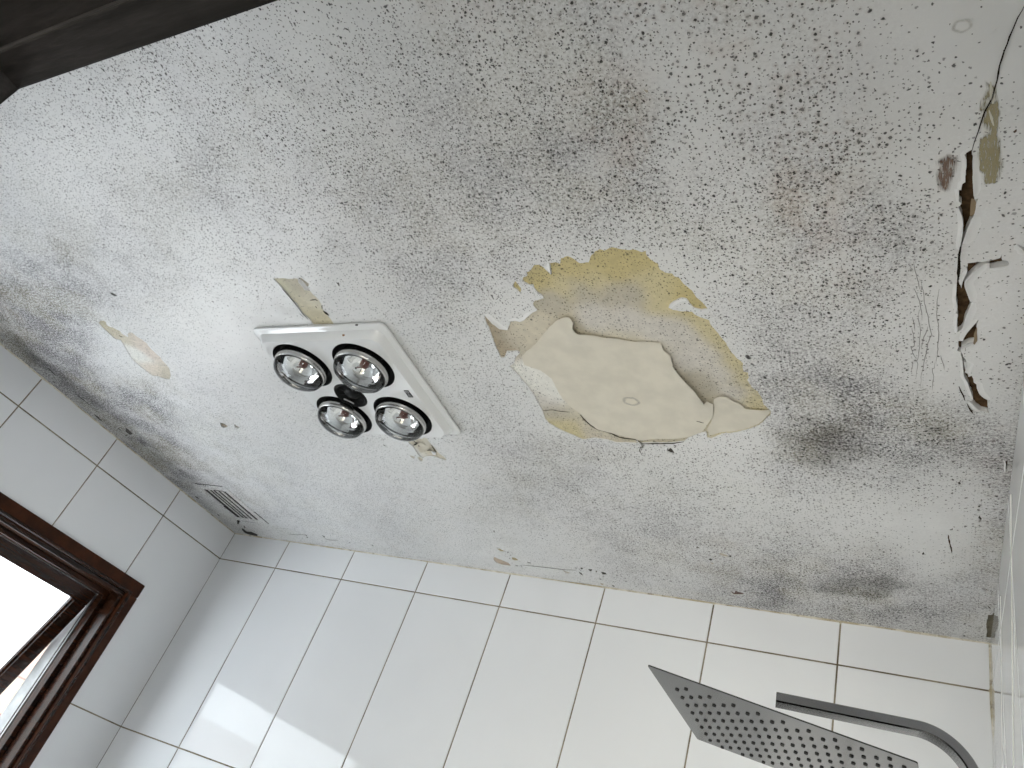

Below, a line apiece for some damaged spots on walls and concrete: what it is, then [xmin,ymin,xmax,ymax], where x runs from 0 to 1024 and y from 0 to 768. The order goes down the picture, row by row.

crack [911,7,1024,391]
peeling [99,321,171,379]
peeling [275,278,334,324]
peeling [484,247,771,453]
peeling [952,257,1009,414]
leakage [775,418,867,474]